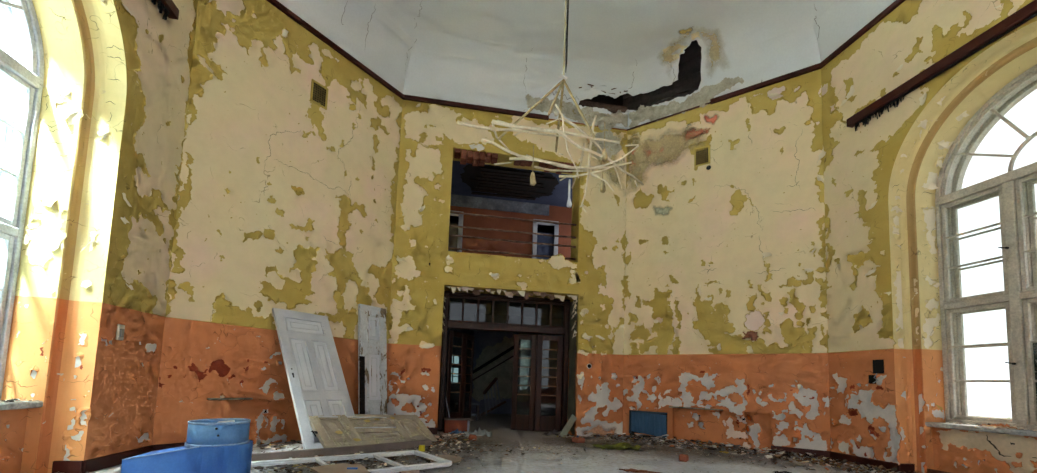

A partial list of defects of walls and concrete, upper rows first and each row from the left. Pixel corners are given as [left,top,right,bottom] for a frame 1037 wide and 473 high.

peeling [22,90,84,271]
peeling [98,101,116,142]
peeling [120,0,499,353]
damp [587,115,718,187]
peeling [80,231,100,255]
peeling [446,0,1037,473]
peeling [2,347,44,402]
peeling [62,394,91,461]
peeling [73,332,114,380]
peeling [253,351,289,444]
peeling [385,364,441,428]
crack [986,435,1036,458]